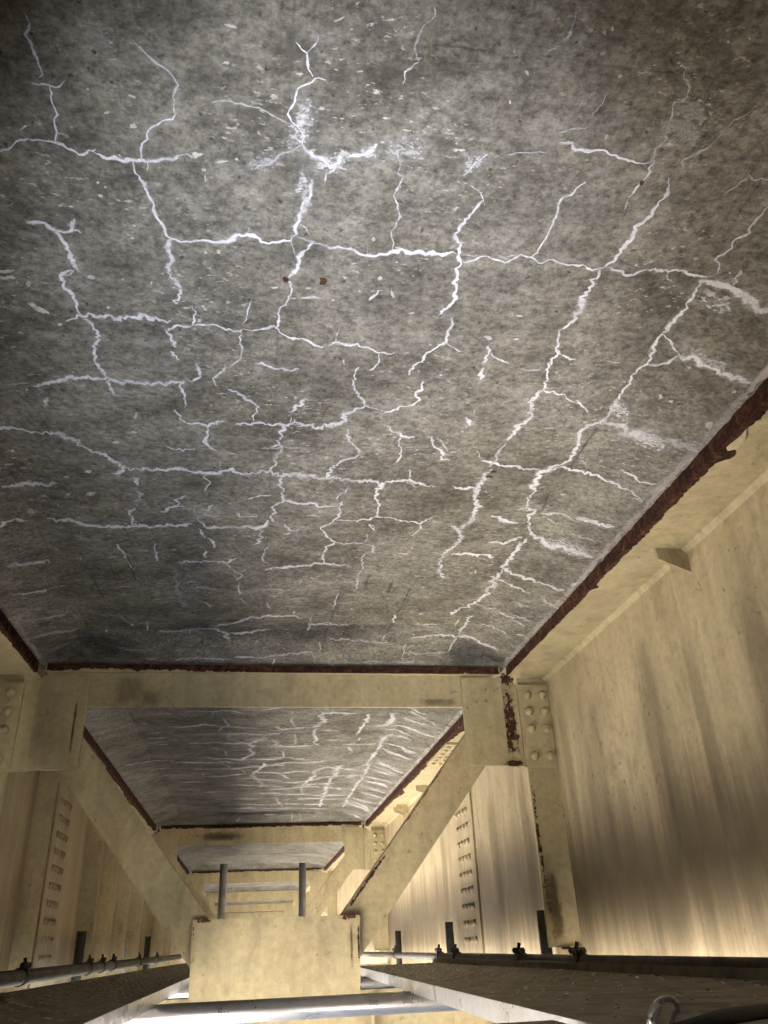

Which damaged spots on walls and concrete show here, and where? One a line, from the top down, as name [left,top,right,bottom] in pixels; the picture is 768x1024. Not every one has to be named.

damp [287,102,316,149]
damp [295,140,422,193]
crack [0,13,768,666]
corrosion [0,377,768,767]
corrosion [83,715,465,834]
crack [125,708,436,822]